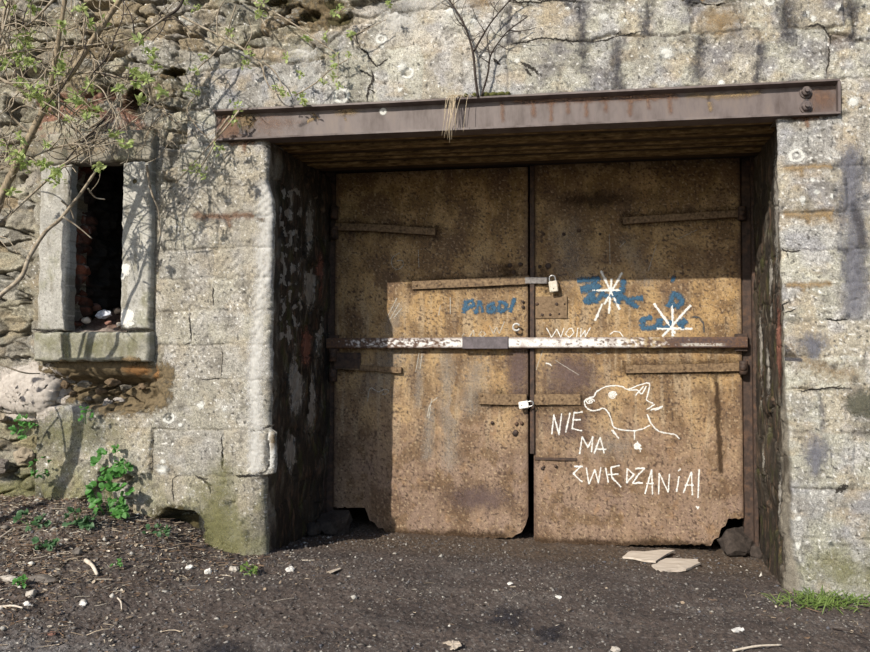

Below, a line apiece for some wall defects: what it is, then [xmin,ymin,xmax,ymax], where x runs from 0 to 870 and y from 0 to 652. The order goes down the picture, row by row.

crack [508,31,643,46]
rust [514,93,677,120]
rust [218,114,255,150]
damp [842,146,865,313]
rust [408,264,528,293]
spalling [38,357,175,417]
rust [496,348,527,394]
rust [543,357,601,394]
rust [549,408,584,436]
rust [677,359,739,473]
spalling [150,504,199,528]
rust [535,537,708,546]